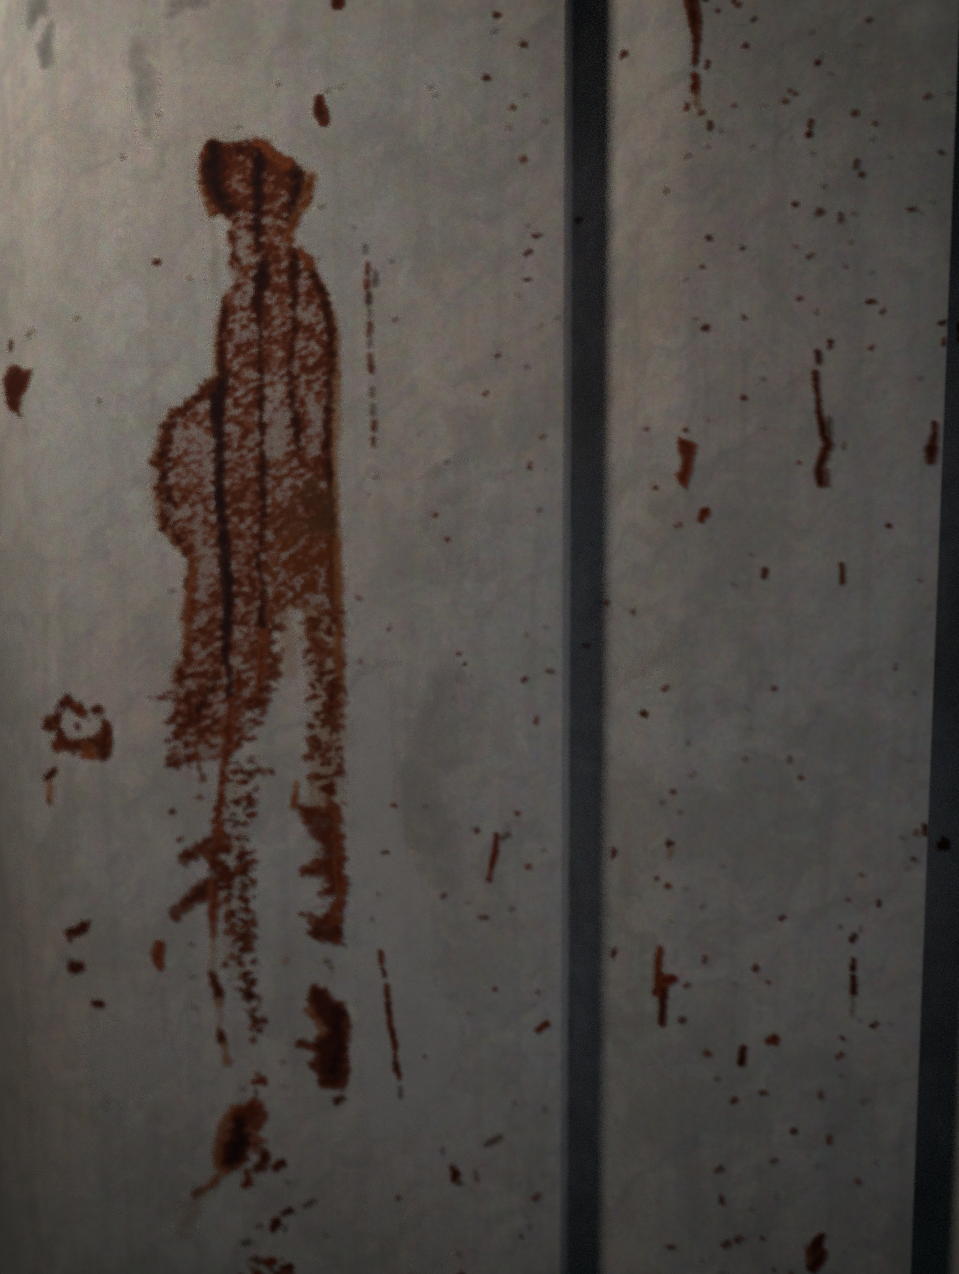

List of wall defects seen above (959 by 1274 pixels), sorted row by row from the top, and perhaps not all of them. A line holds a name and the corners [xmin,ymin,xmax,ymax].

rust [683,0,741,130]
rust [2,339,32,417]
rust [675,428,697,488]
rust [812,339,844,487]
rust [149,138,360,1065]
rust [42,693,113,804]
rust [294,984,351,1106]
rust [378,949,402,1098]
rust [652,945,690,1027]
rust [192,1071,286,1198]
rust [239,1198,316,1274]